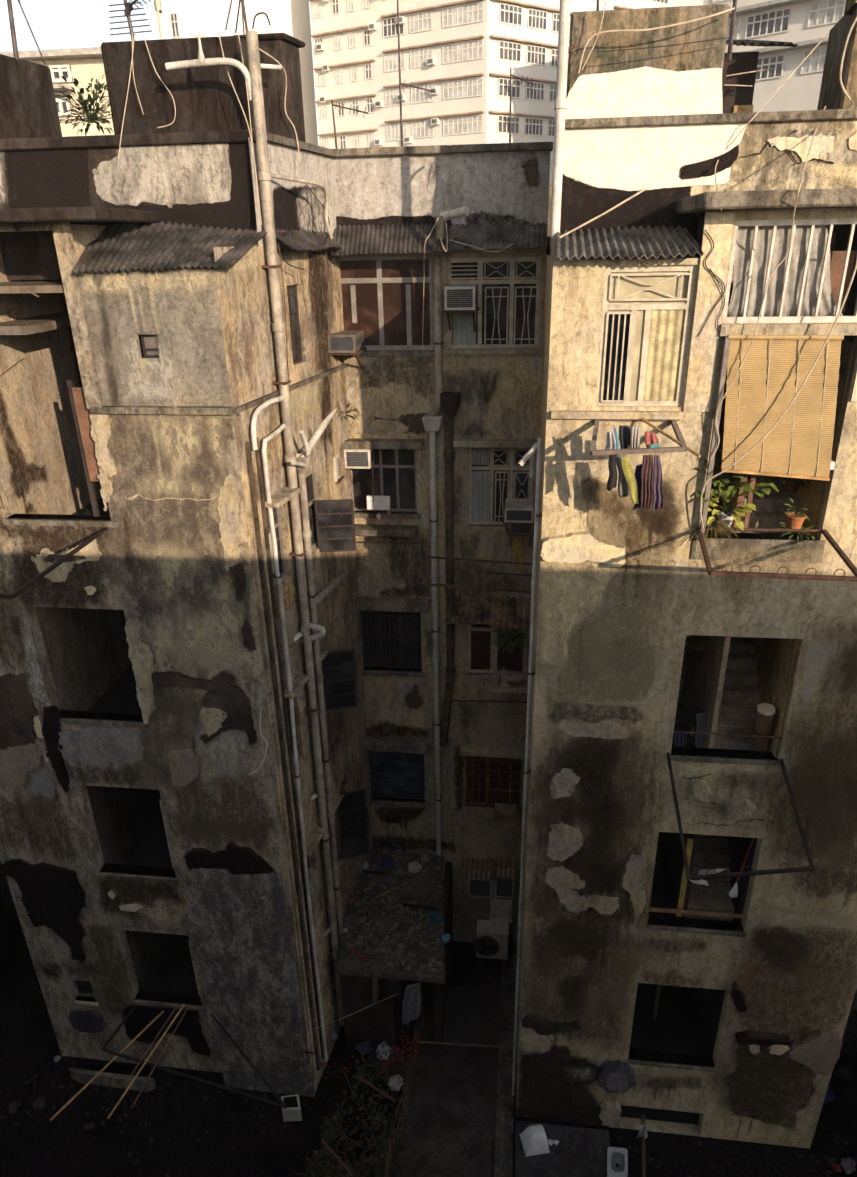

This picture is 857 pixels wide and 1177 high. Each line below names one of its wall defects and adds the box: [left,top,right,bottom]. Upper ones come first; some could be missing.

peeling [92,143,232,208]
peeling [767,131,857,162]
damp [86,245,258,346]
peeling [90,414,117,511]
peeling [31,539,102,583]
damp [0,340,251,707]
peeling [540,531,626,568]
damp [583,476,679,555]
damp [542,563,639,664]
spalling [124,617,257,747]
damp [723,624,857,907]
damp [724,926,857,1137]